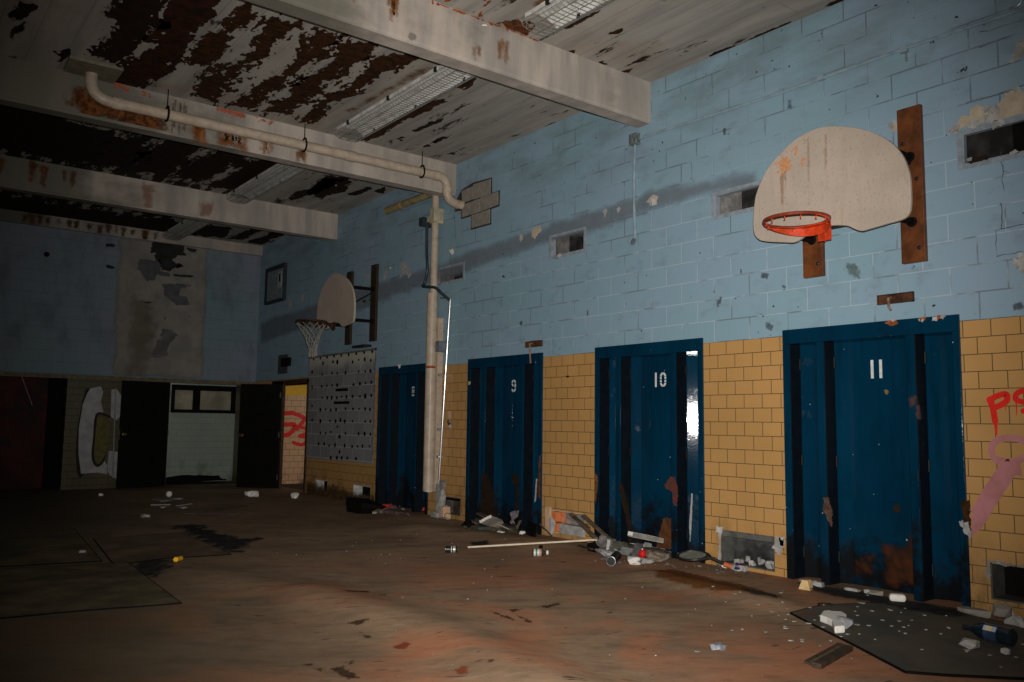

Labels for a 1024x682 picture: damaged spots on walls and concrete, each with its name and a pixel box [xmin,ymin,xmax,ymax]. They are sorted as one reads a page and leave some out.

peeling [553,10,601,35]
peeling [86,0,420,125]
rust [71,87,167,131]
peeling [947,85,1024,135]
peeling [0,106,278,189]
rust [664,476,678,506]
rust [823,497,833,527]
rust [856,538,914,586]